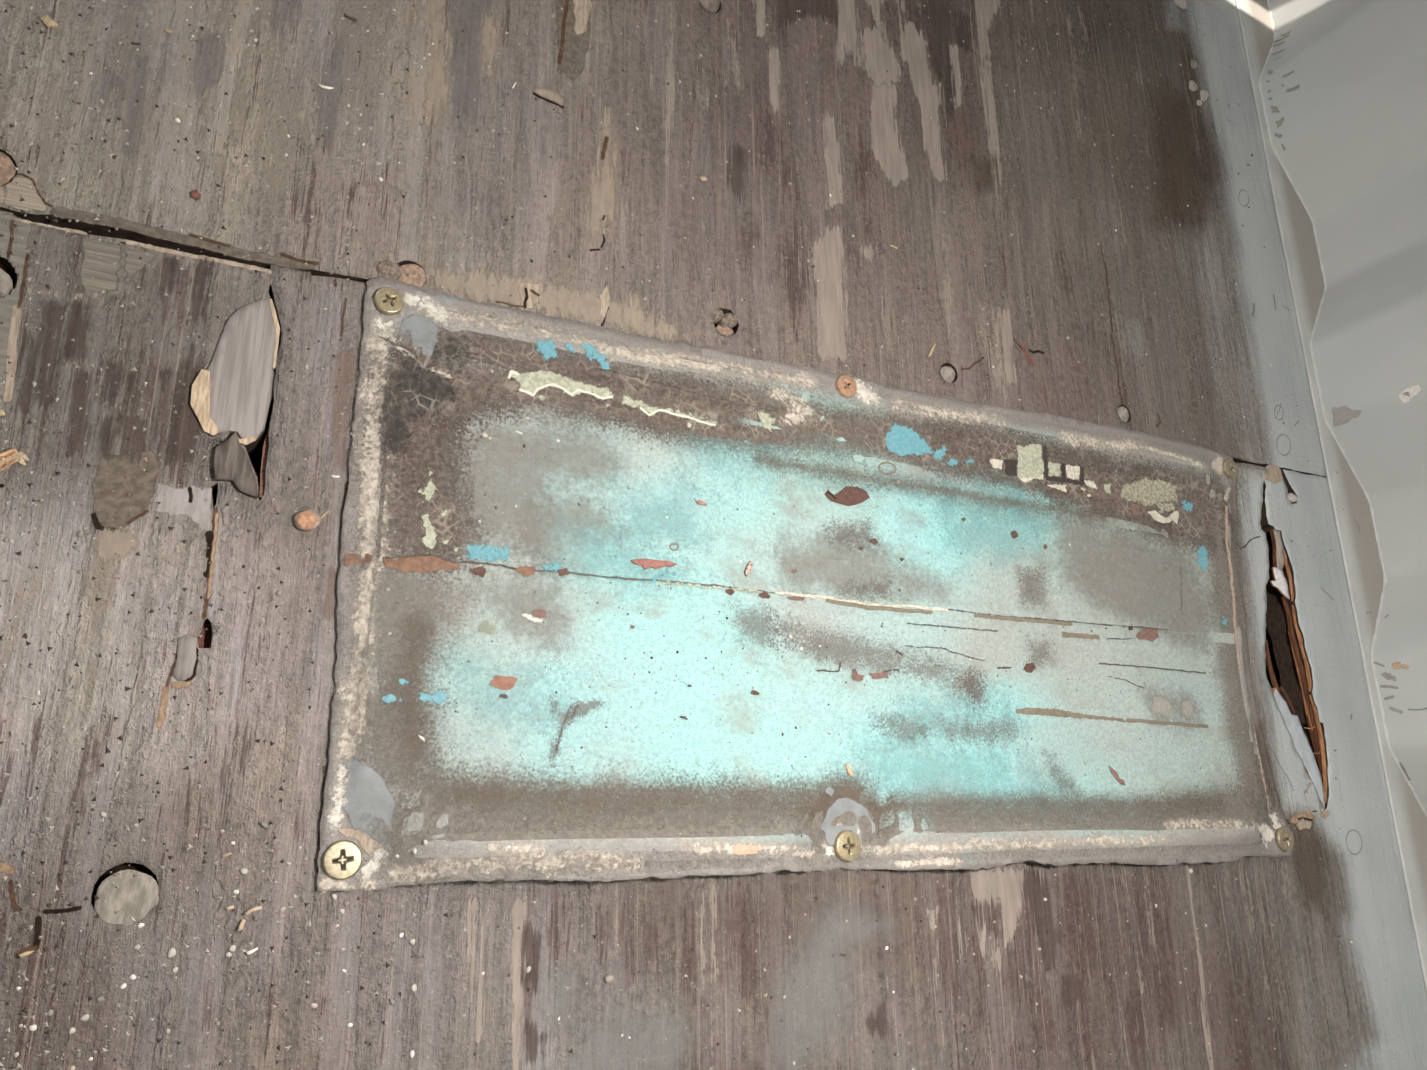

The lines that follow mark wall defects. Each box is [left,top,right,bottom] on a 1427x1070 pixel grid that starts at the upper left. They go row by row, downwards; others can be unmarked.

peeling [490,369,717,428]
peeling [758,412,776,432]
peeling [989,443,1179,524]
peeling [825,486,870,506]
peeling [344,468,486,577]
peeling [515,566,535,577]
rust [350,325,1273,880]
peeling [522,609,546,622]
peeling [1128,627,1159,642]
peeling [816,662,899,681]
peeling [490,665,518,699]